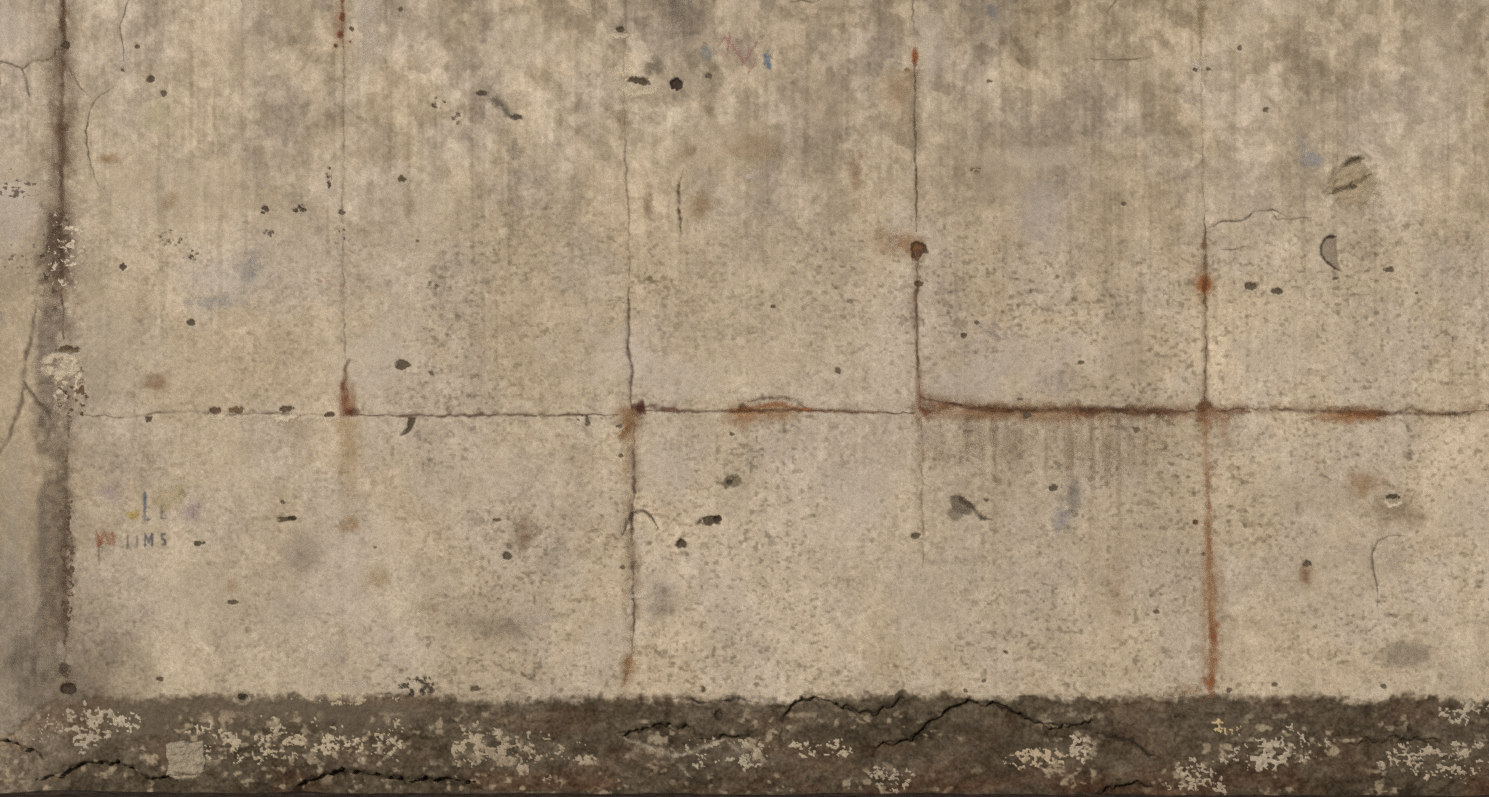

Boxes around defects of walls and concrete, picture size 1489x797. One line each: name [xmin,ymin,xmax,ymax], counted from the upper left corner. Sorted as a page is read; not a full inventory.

crack [25,0,89,358]
spalling [1330,158,1378,211]
rust [1198,274,1210,291]
rust [622,401,686,434]
rust [733,397,812,421]
rust [1120,407,1170,416]
rust [1197,401,1249,424]
rust [1328,410,1387,421]
crack [10,393,162,645]
rust [1194,502,1218,642]
spalling [233,690,251,705]